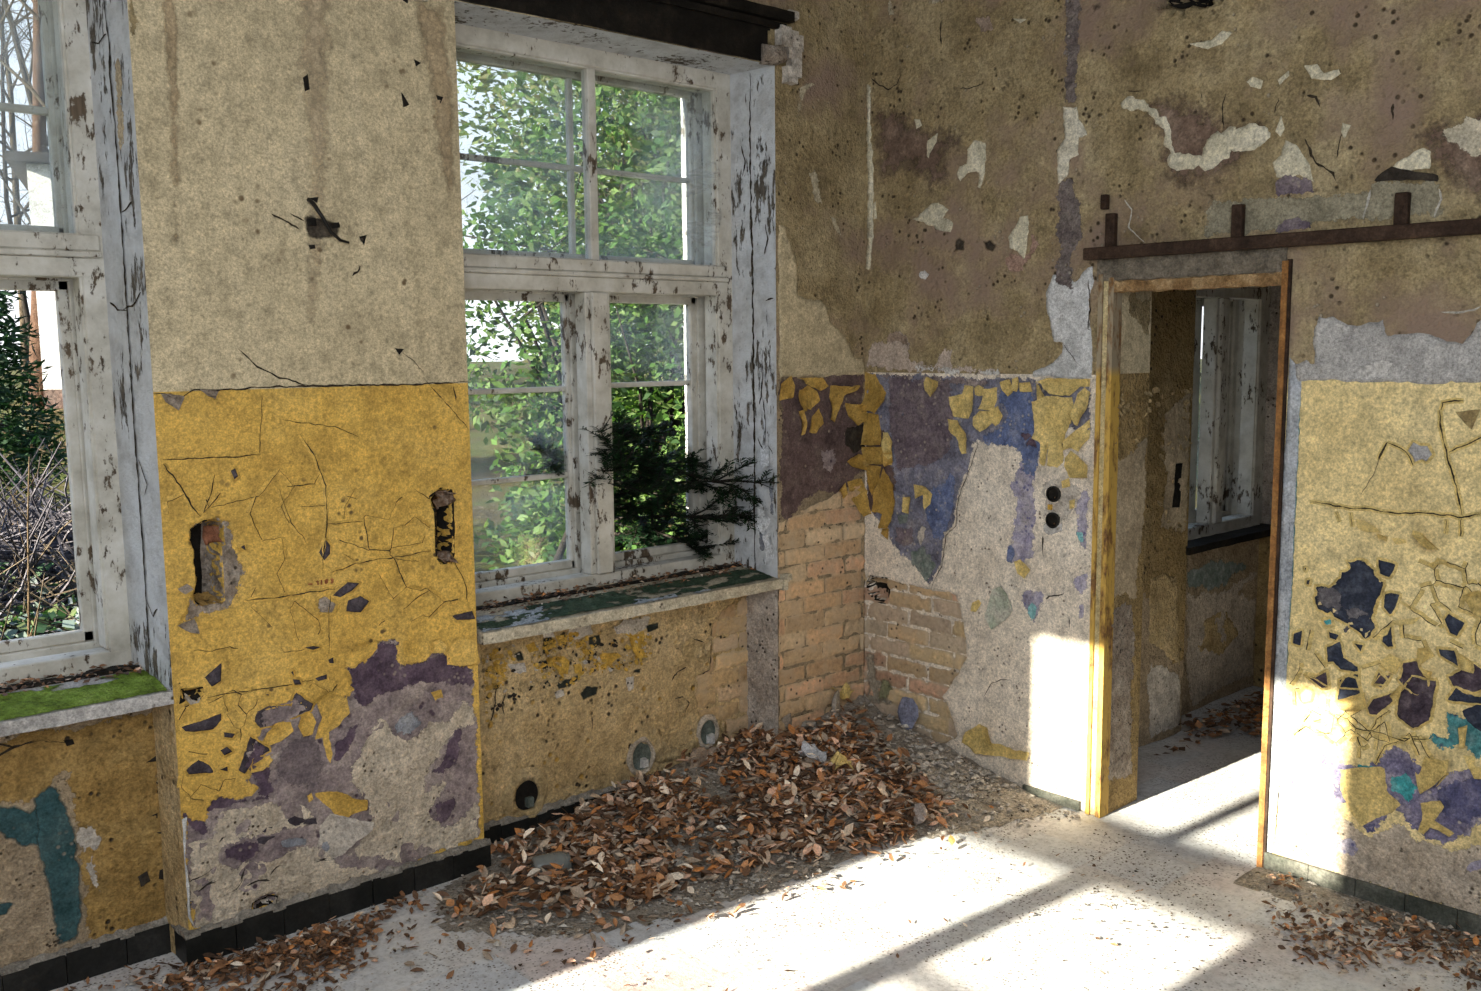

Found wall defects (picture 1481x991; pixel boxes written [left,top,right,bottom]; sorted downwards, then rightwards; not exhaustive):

spalling [1161,0,1213,10]
spalling [178,517,248,634]
peeling [228,465,241,482]
crack [92,0,471,802]
peeling [316,537,333,563]
peeling [178,589,748,928]
peeling [757,372,1091,761]
peeling [1276,557,1481,915]
crack [1289,386,1481,759]